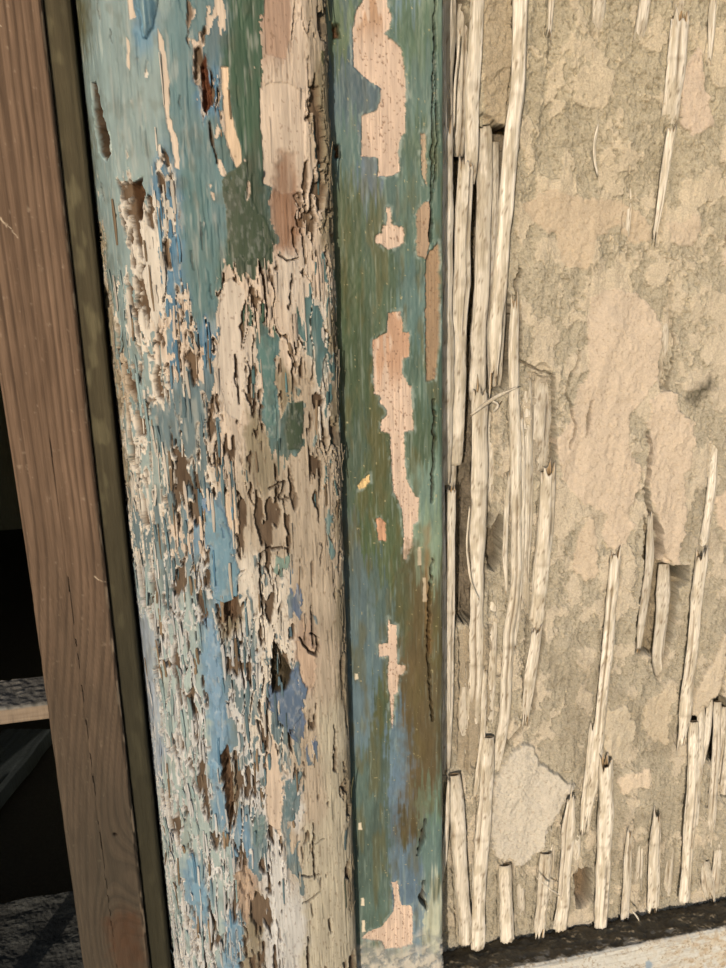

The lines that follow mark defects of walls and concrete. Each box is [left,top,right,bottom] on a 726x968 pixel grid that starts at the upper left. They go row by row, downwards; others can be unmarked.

peeling [321,0,407,177]
peeling [74,0,345,968]
peeling [373,311,420,560]
spalling [445,179,492,777]
crack [513,268,594,469]
peeling [531,289,697,761]
crack [635,430,665,561]
crack [658,316,677,392]
peeling [378,620,406,726]
peeling [362,881,413,950]
crack [416,818,428,856]
crack [418,880,429,912]